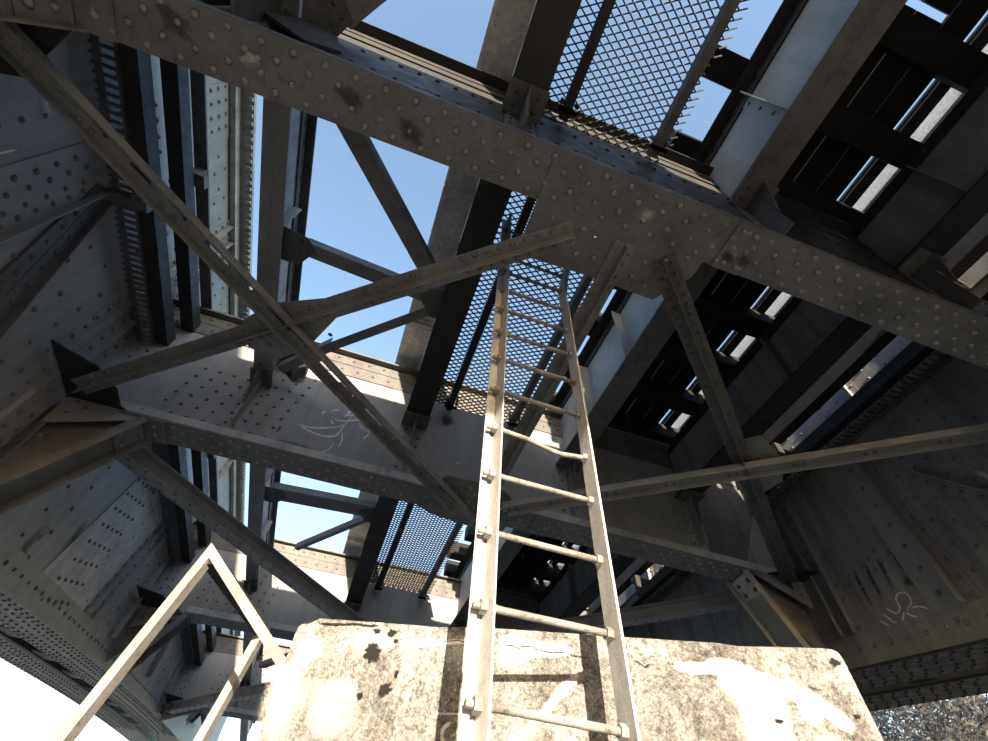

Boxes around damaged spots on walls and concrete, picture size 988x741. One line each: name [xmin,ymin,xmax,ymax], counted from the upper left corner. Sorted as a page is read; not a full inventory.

crack [503,645,590,658]